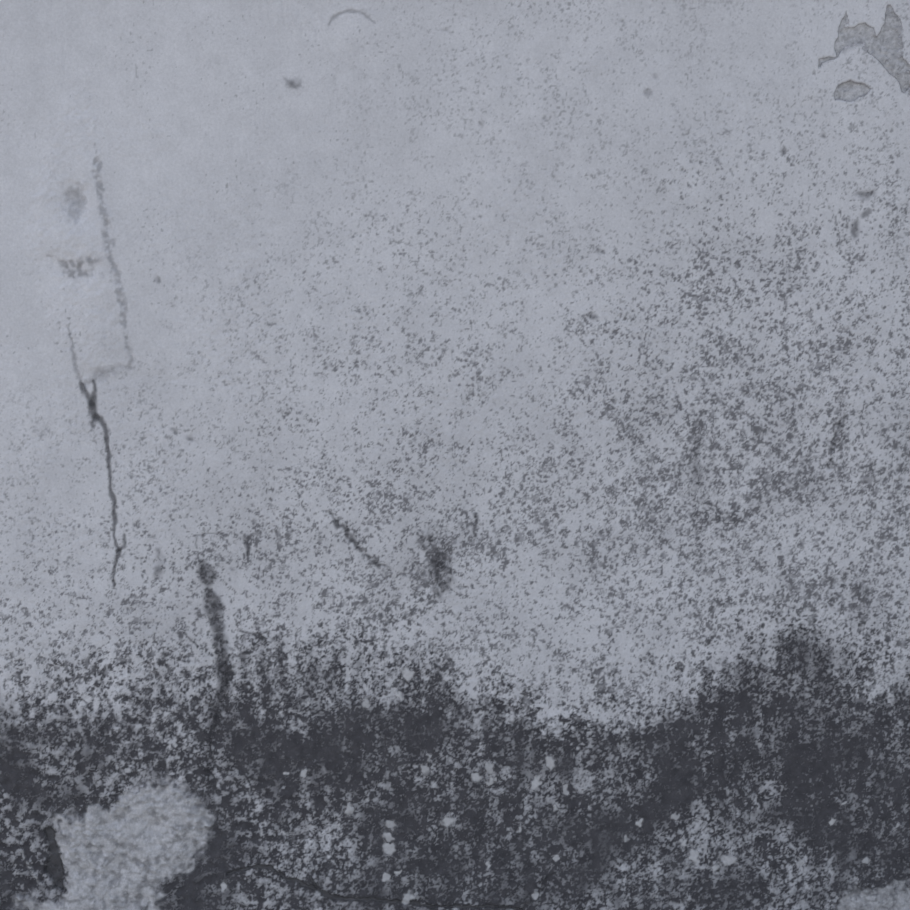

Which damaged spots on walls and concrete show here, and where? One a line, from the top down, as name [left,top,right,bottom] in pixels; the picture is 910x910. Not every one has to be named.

spalling [835,81,871,101]
spalling [819,5,910,94]
leakage [0,561,910,910]
crack [227,864,523,910]